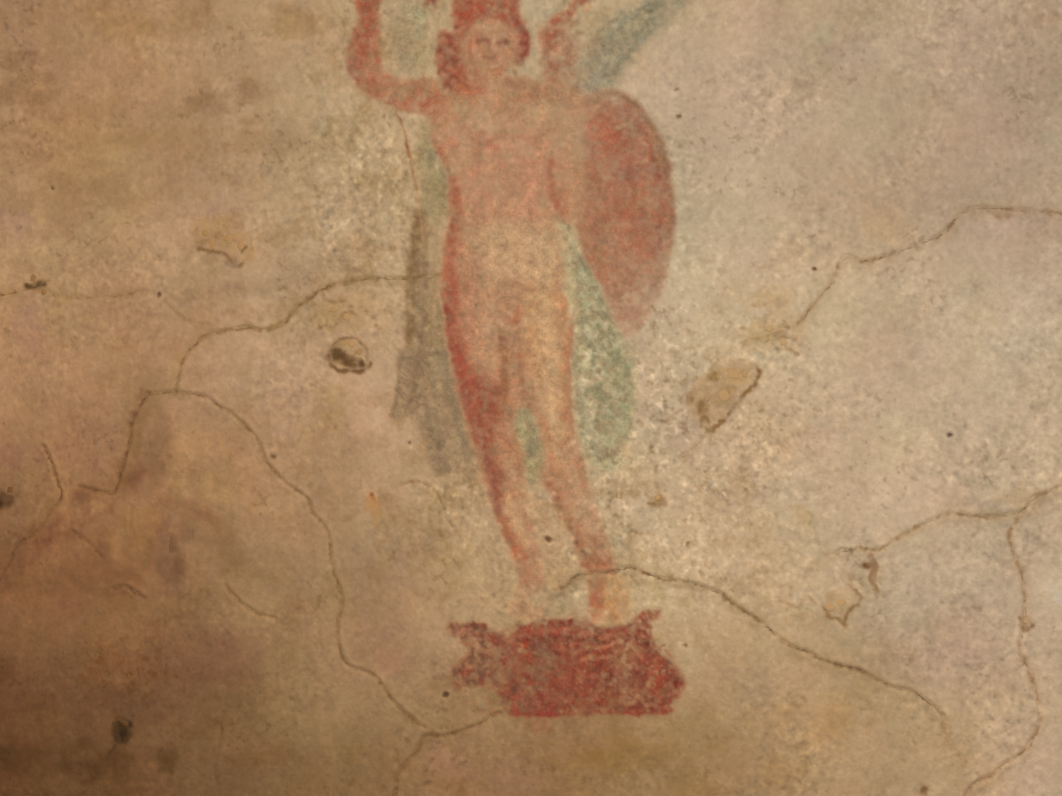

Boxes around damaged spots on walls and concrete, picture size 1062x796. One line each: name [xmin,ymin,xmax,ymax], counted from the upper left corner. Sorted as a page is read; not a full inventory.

crack [797,207,1062,326]
crack [87,275,434,494]
spalling [326,336,372,375]
spalling [686,363,762,432]
spalling [0,486,13,511]
crack [843,521,930,553]
crack [560,567,948,740]
crack [957,486,1058,788]
crack [371,673,494,789]